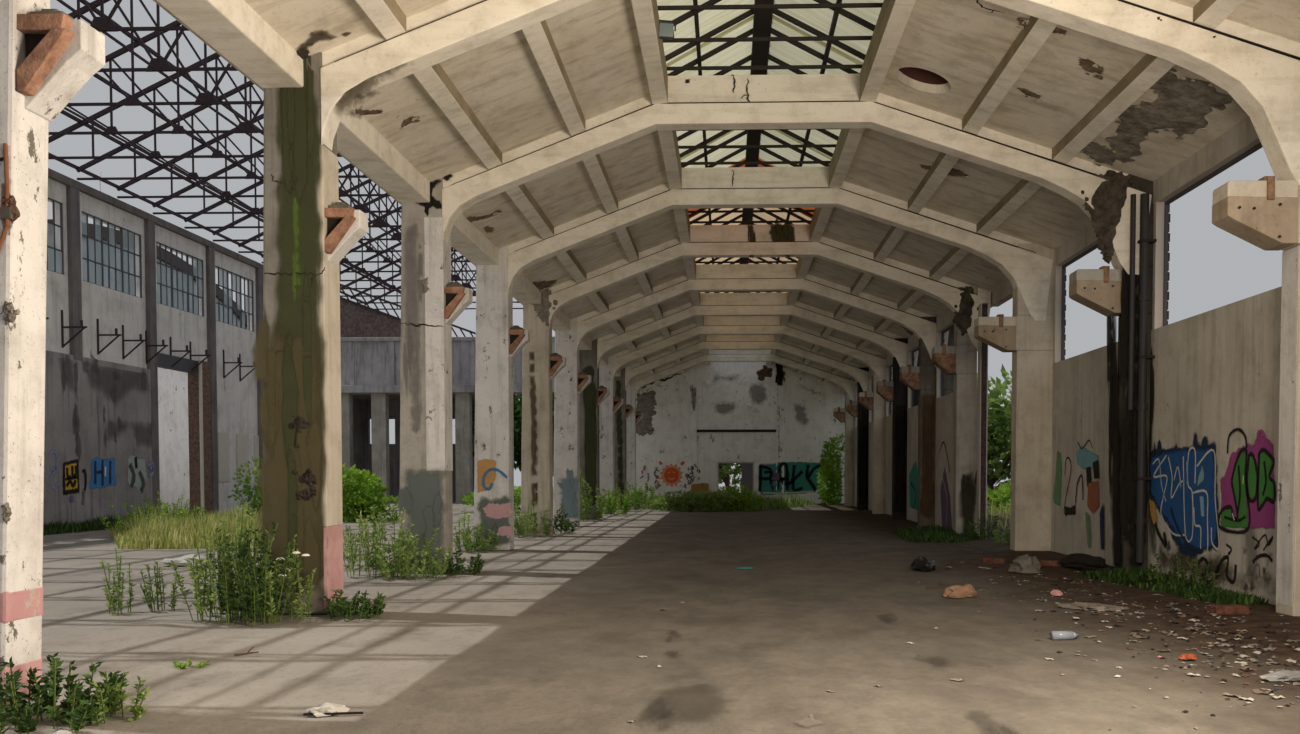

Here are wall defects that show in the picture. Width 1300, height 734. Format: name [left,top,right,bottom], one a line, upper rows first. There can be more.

corrosion [0,143,13,249]
leakage [281,30,351,205]
peeling [1079,67,1232,264]
leakage [62,356,152,459]
spalling [577,375,657,436]